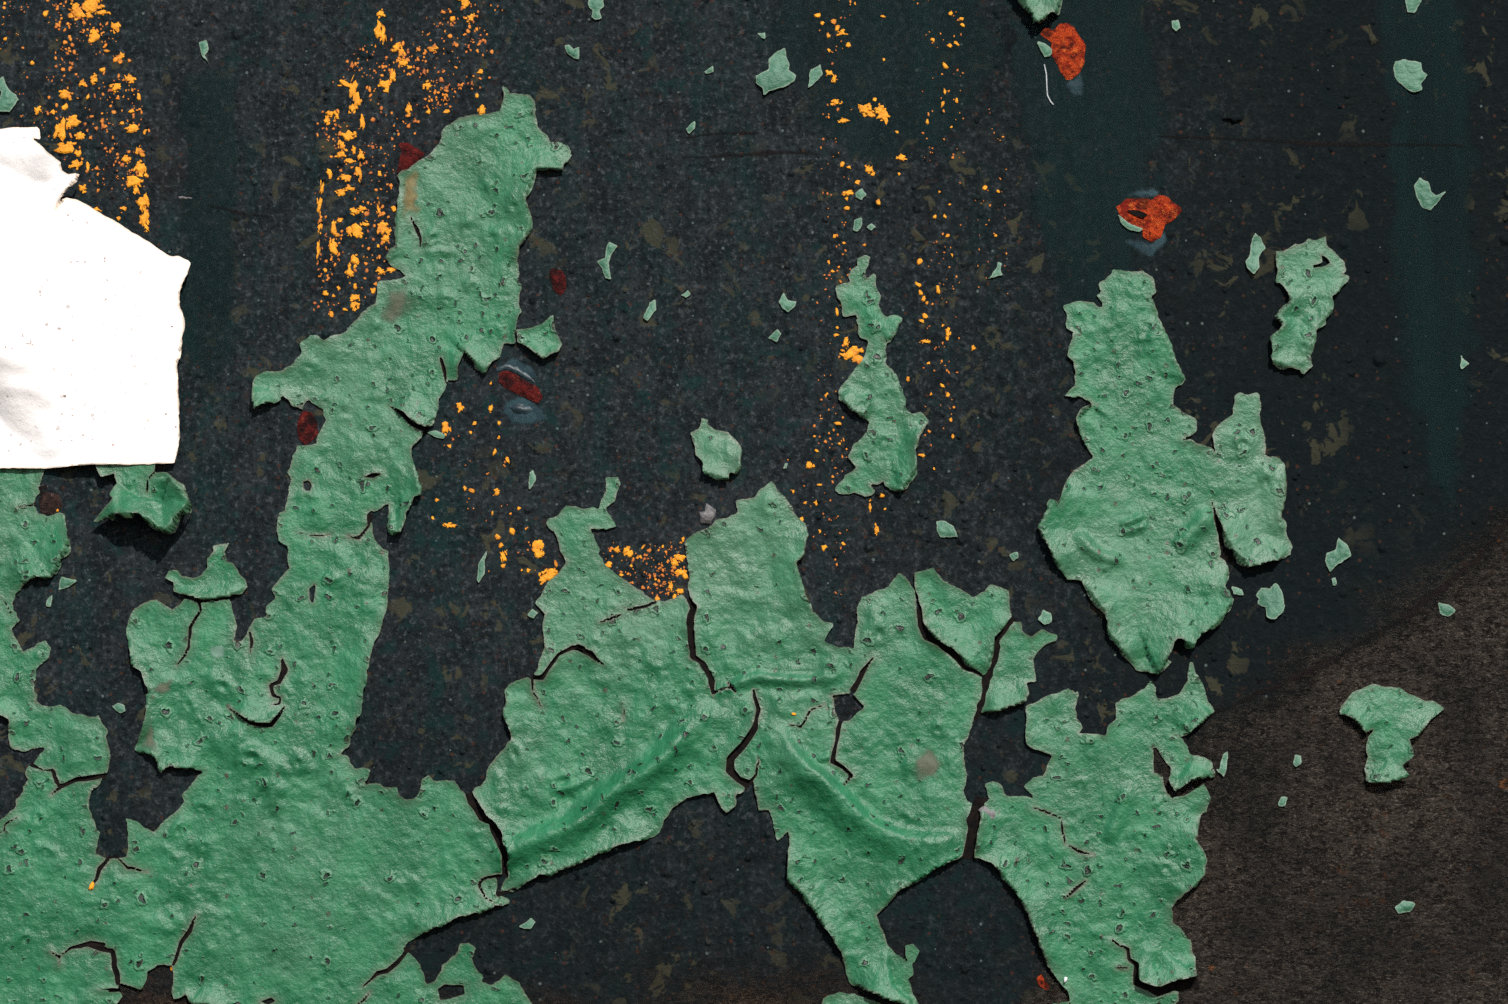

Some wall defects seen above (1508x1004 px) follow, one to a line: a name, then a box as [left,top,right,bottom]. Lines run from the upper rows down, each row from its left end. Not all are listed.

corrosion [1037,23,1086,95]
corrosion [397,142,424,210]
corrosion [1117,189,1182,255]
peeling [0,86,1293,1004]
peeling [1325,538,1351,586]
peeling [1438,603,1455,617]
crack [530,598,873,790]
crack [916,608,1016,720]
peeling [1339,684,1443,784]
crack [94,854,142,885]
peeling [1395,901,1415,913]
crack [52,941,122,993]